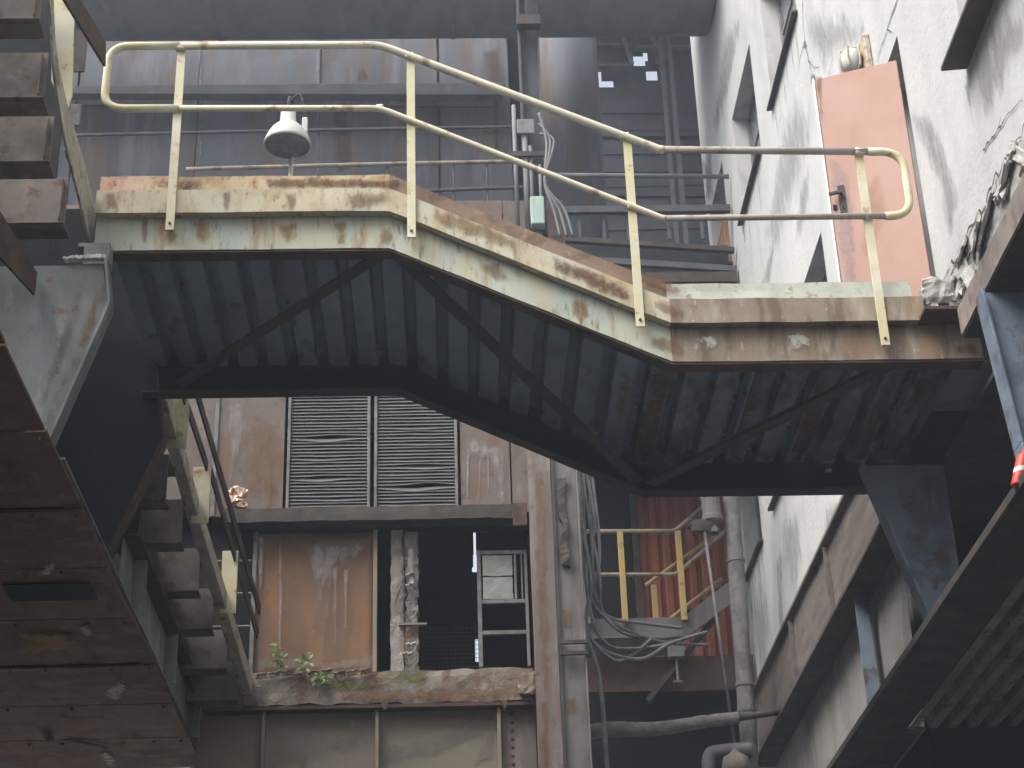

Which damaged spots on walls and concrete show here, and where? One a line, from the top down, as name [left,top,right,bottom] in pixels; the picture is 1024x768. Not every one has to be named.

peeling [942,124,1024,299]
corrosion [556,260,628,298]
damp [311,543,363,600]
spalling [406,548,416,591]